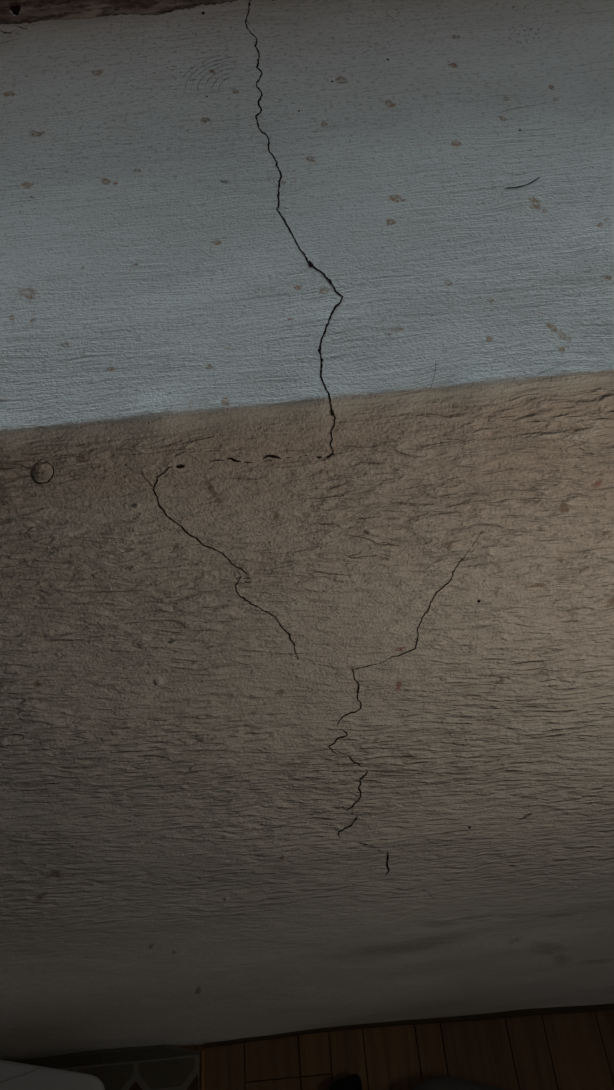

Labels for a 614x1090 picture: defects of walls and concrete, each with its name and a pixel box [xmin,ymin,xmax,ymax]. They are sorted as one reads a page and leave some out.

crack [211,0,343,463]
crack [142,465,298,657]
crack [308,523,401,579]
crack [328,531,483,875]